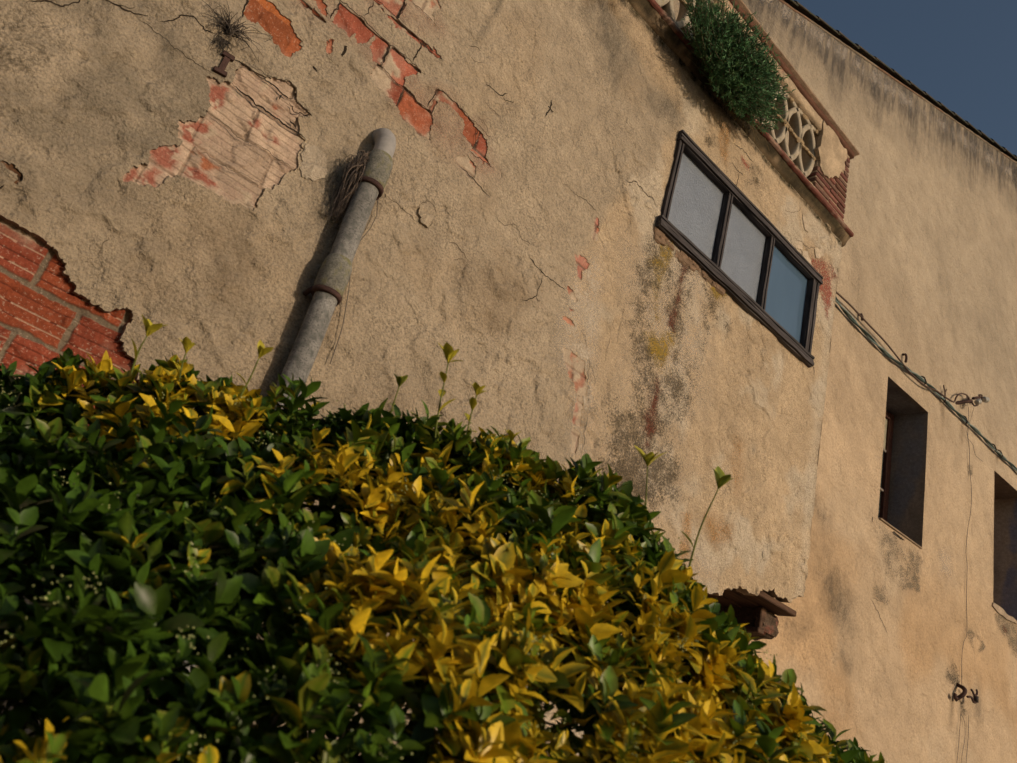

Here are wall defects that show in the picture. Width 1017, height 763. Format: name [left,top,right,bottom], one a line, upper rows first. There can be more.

flaking render [0,215,140,384]